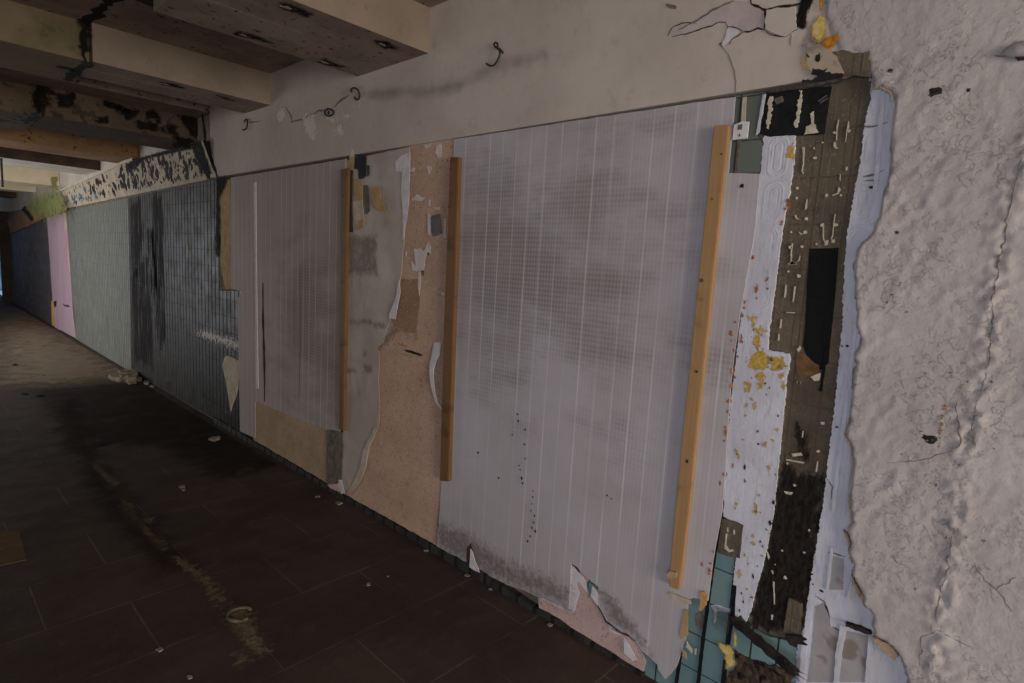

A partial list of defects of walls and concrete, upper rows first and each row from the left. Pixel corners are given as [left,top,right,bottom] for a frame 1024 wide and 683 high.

crack [20,0,124,124]
crack [668,0,801,91]
peeling [801,43,844,83]
water stain [52,93,76,108]
water stain [95,100,198,150]
peeling [64,140,213,206]
water stain [130,194,165,369]
peeling [393,327,442,409]
peeling [835,419,864,603]
spalling [719,632,794,683]
peeling [845,621,899,661]